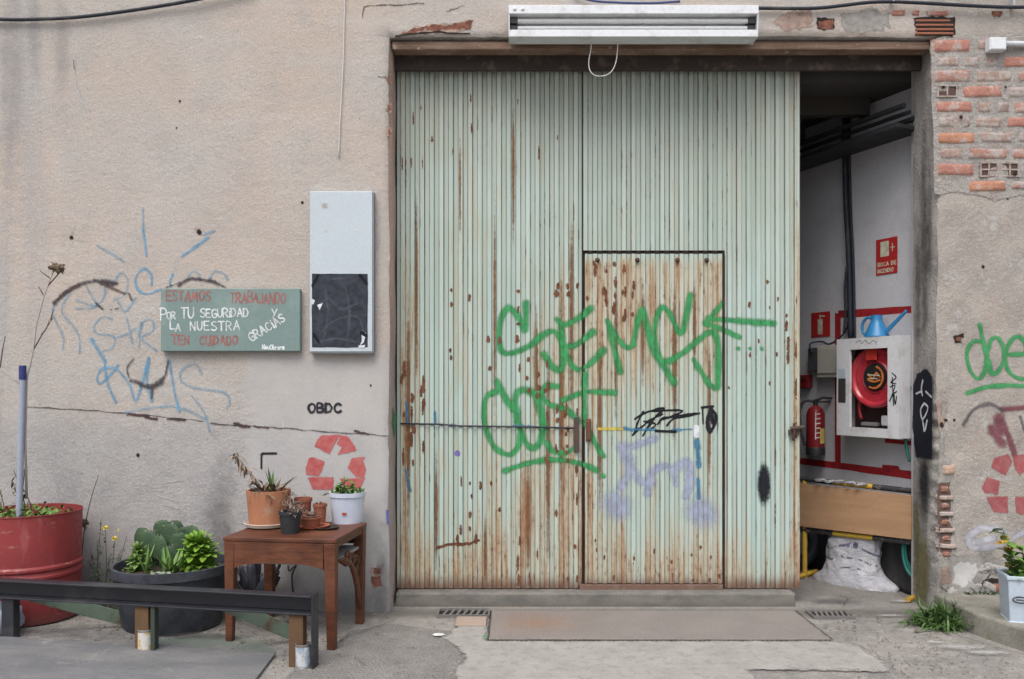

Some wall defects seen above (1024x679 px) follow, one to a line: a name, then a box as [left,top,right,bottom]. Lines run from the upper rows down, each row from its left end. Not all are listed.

flaking render [395,20,473,37]
flaking render [774,7,1024,201]
crack [33,407,385,436]
rust [400,212,426,498]
rust [486,232,502,389]
rust [518,245,589,540]
rust [592,260,645,399]
rust [775,314,797,364]
rust [435,473,493,576]
rust [516,470,538,586]
leakage [897,502,929,605]
spalling [935,401,1014,594]